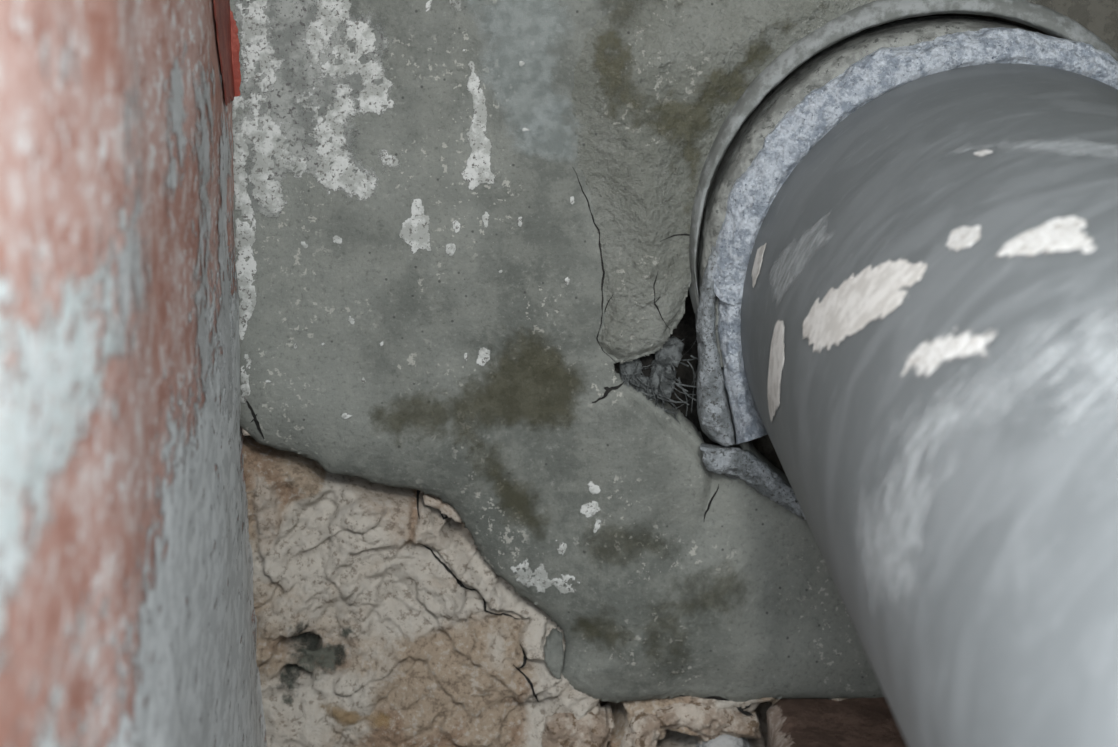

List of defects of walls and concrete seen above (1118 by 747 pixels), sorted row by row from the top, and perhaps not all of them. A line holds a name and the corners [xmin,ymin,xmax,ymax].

water stain [595,32,770,174]
peeling [0,67,151,678]
spalling [95,0,780,747]
water stain [376,335,580,435]
crack [573,168,625,403]